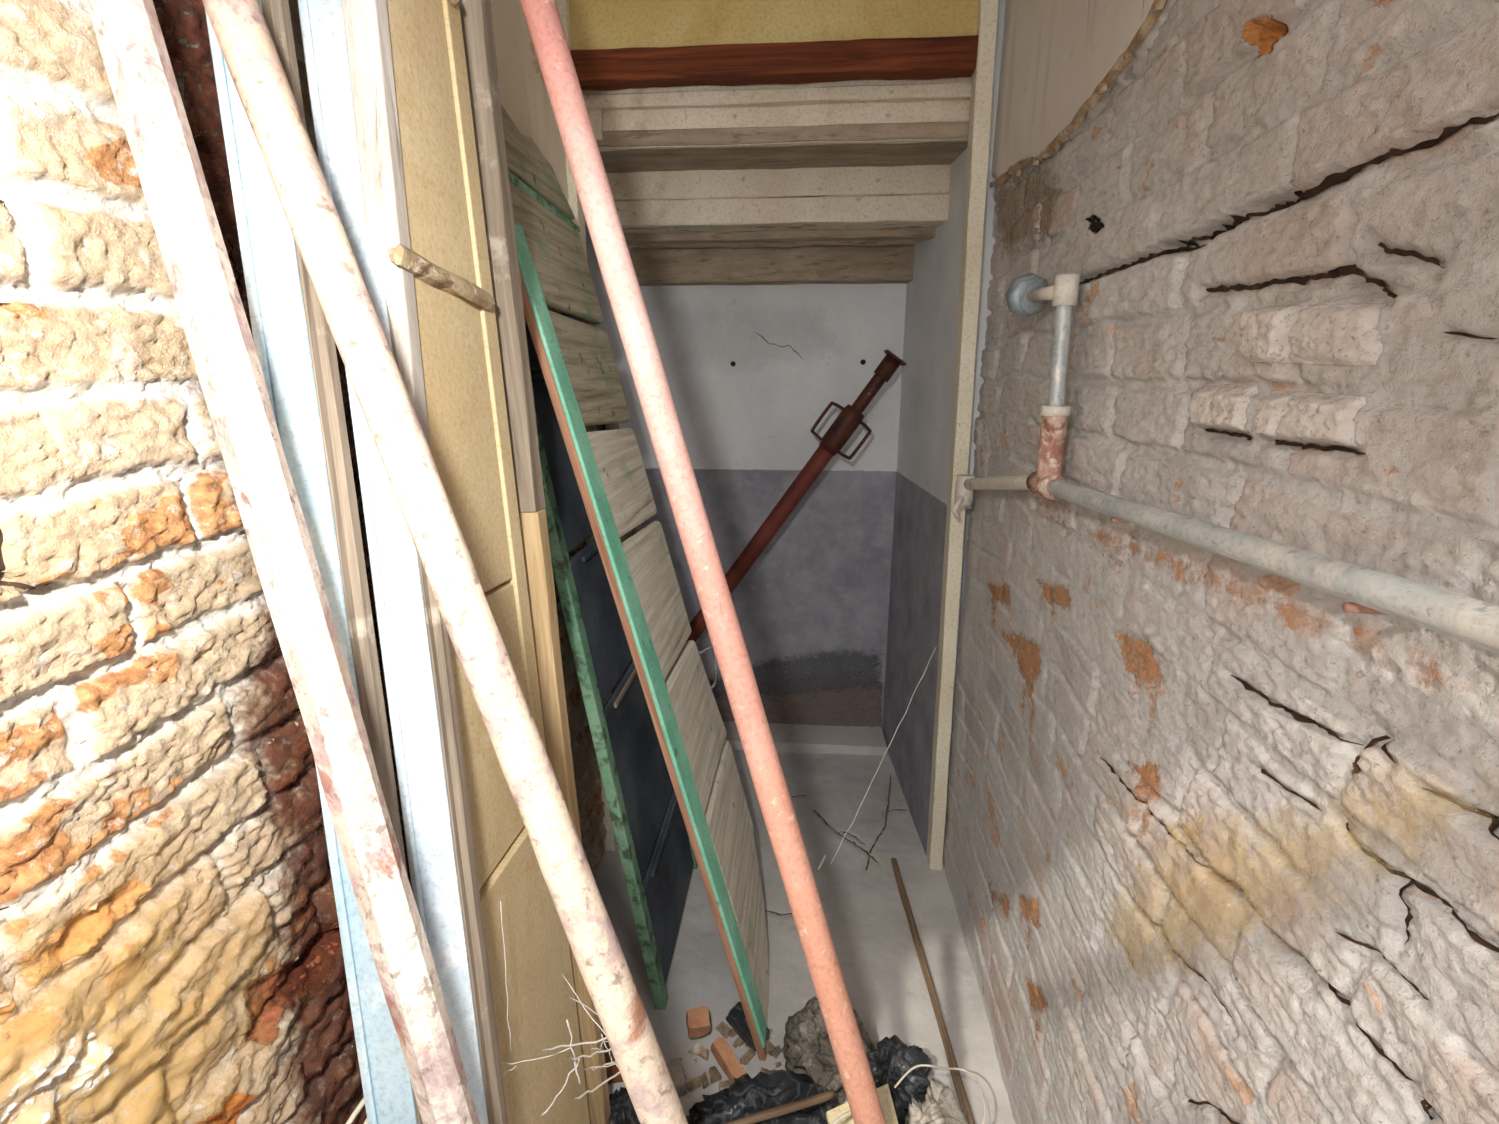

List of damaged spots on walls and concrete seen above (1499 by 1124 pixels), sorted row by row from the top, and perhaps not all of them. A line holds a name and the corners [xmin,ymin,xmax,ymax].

leakage [153,0,254,341]
crack [1079,113,1499,285]
crack [1206,242,1445,299]
crack [1443,331,1498,340]
leakage [335,343,412,889]
crack [1231,675,1499,840]
leakage [237,604,367,1124]
crack [1260,767,1499,1000]
leakage [0,1029,114,1124]
spalling [197,1093,259,1124]
crack [1188,1099,1239,1124]
crack [1301,952,1443,1120]